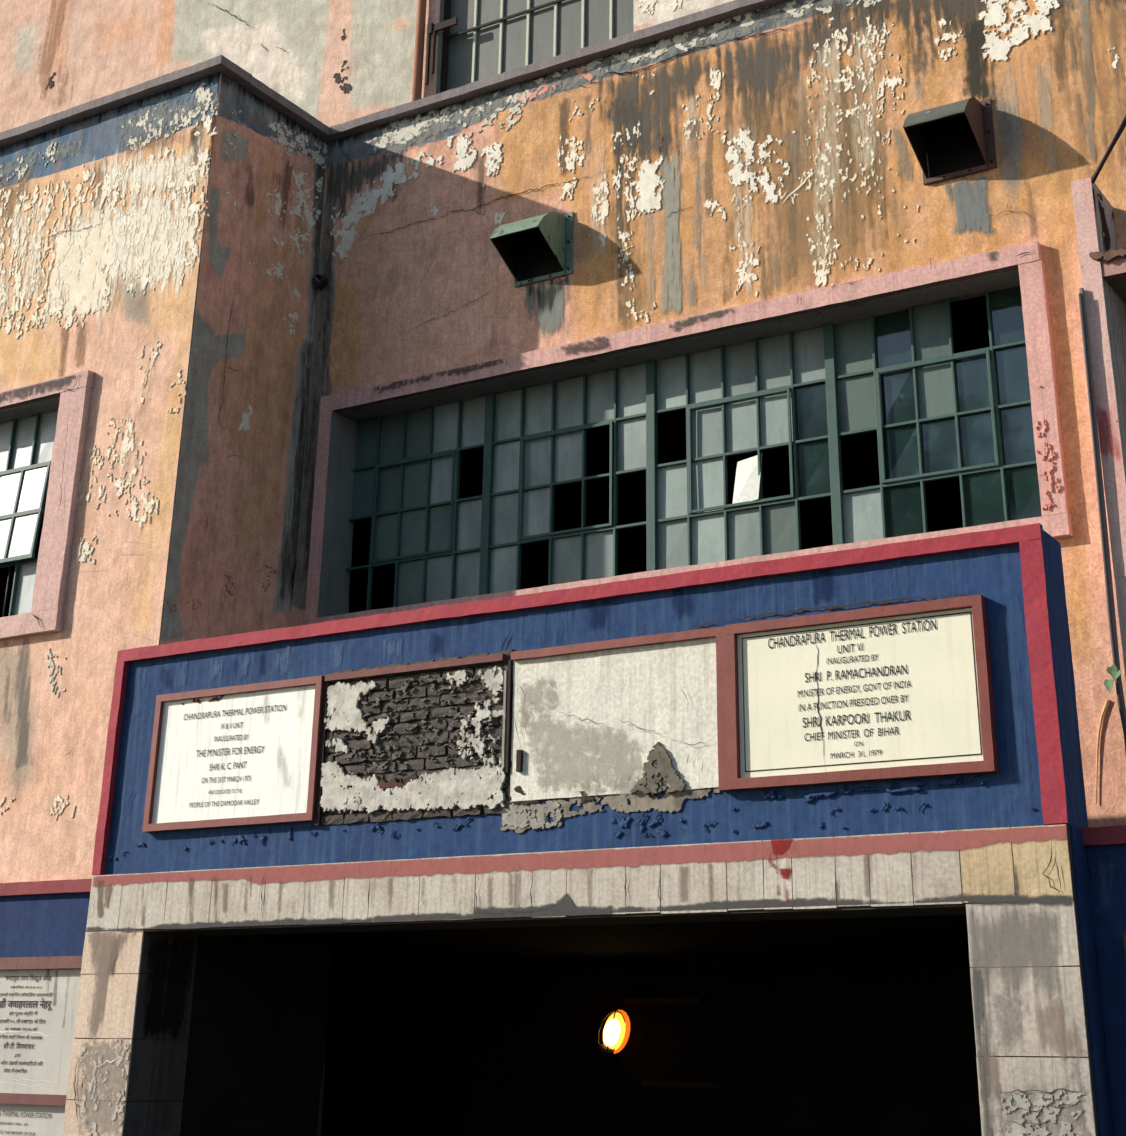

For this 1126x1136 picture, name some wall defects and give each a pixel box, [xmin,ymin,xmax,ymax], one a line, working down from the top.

peeling [935,19,964,61]
peeling [978,0,1060,62]
peeling [0,0,906,339]
water stain [473,155,484,203]
water stain [559,100,568,174]
water stain [585,0,996,331]
peeling [139,341,162,404]
peeling [167,370,187,413]
peeling [76,418,159,528]
peeling [73,535,97,568]
flaking render [378,775,423,789]
flaking render [500,742,721,833]